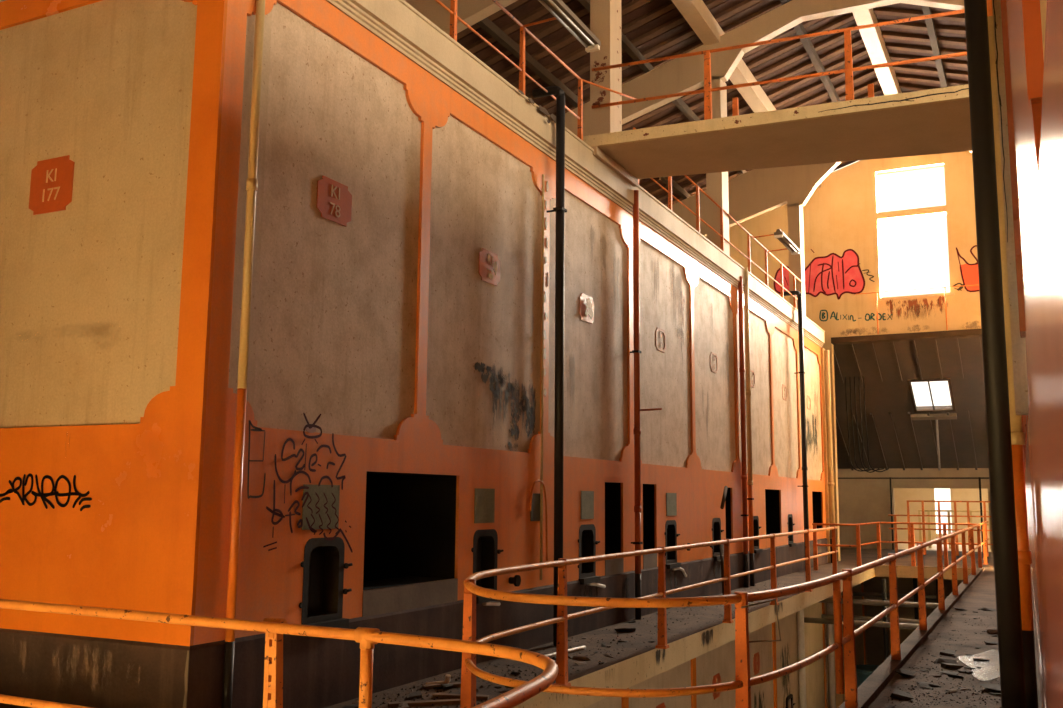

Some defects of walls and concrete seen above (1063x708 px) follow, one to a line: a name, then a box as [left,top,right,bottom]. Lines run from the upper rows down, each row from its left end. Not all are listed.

damp [473,362,536,451]